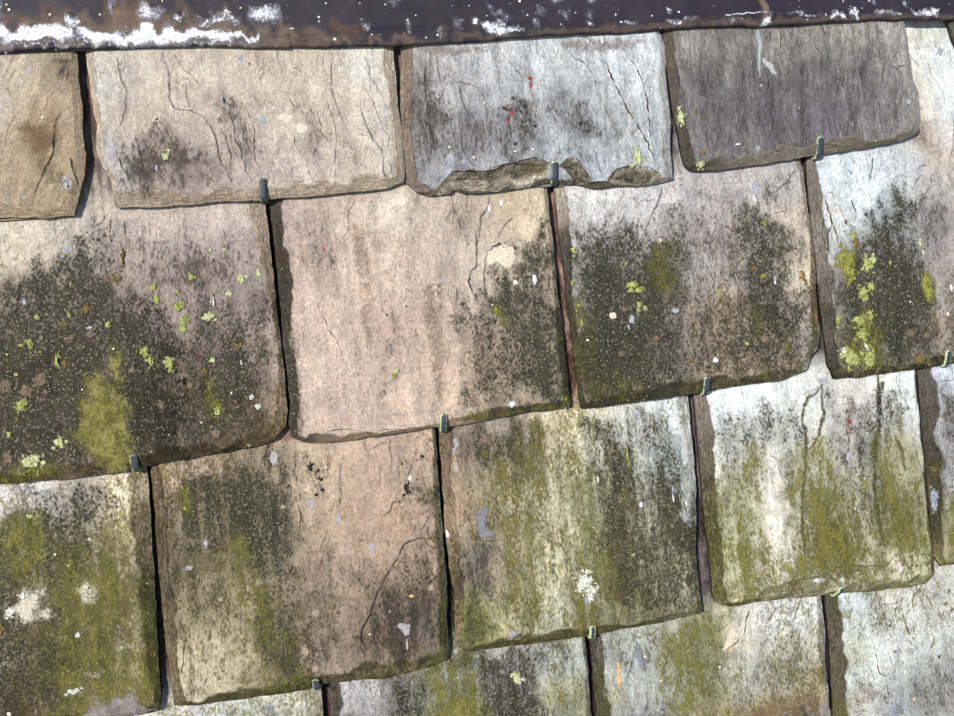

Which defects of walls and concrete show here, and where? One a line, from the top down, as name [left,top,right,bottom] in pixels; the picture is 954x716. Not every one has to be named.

leakage [0,0,260,52]
leakage [249,4,280,22]
leakage [473,6,524,35]
crack [117,61,143,192]
crack [161,53,259,182]
crack [289,57,392,175]
crack [424,15,726,230]
spalling [433,151,592,196]
spalling [607,163,663,186]
crack [437,201,532,300]
leakage [108,345,124,385]
leakage [809,387,826,449]